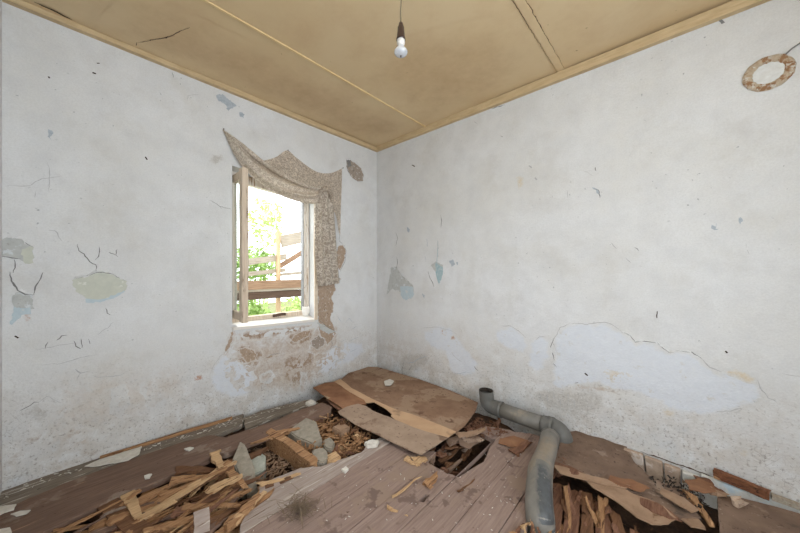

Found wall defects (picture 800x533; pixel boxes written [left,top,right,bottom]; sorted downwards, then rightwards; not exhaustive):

peeling [216,94,245,118]
spalling [346,158,364,182]
peeling [2,235,43,325]
crack [49,230,118,269]
peeling [72,269,127,303]
peeling [337,234,346,271]
peeling [387,261,425,300]
peeling [428,242,458,286]
peeling [209,324,280,400]